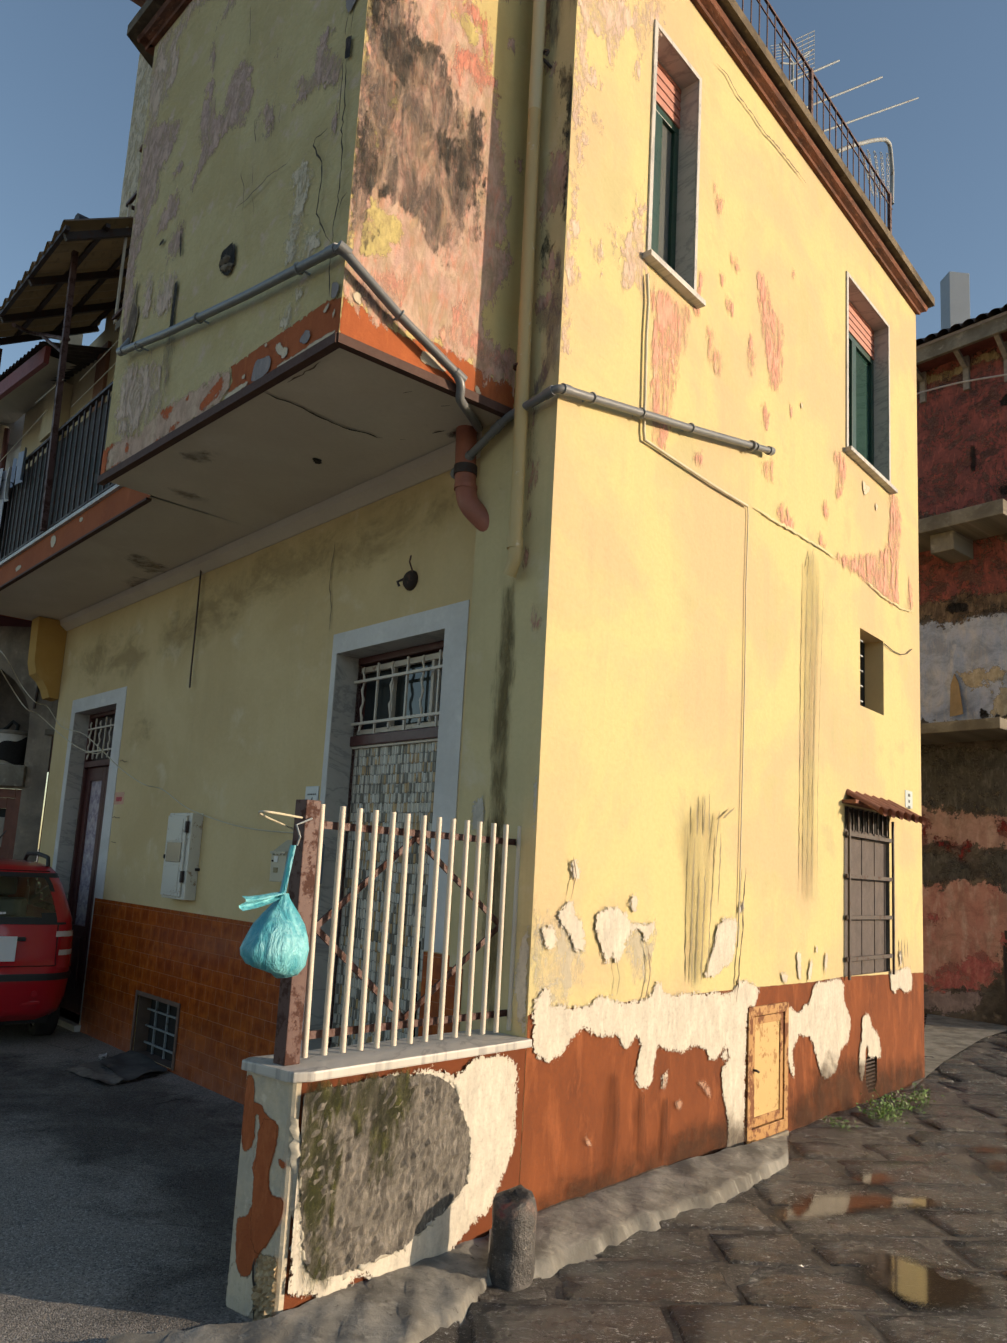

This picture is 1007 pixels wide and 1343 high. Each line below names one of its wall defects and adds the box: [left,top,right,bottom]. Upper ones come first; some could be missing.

crack [236,7,355,294]
peeling [100,0,523,474]
mould [347,0,488,267]
peeling [535,0,703,450]
crack [267,363,402,440]
leakage [484,589,513,1011]
peeling [513,895,760,1149]
leakage [691,794,734,987]
peeling [781,945,882,1081]
flaking render [890,744,1007,1016]
peeling [955,665,1007,719]
flaking render [226,1053,520,1321]